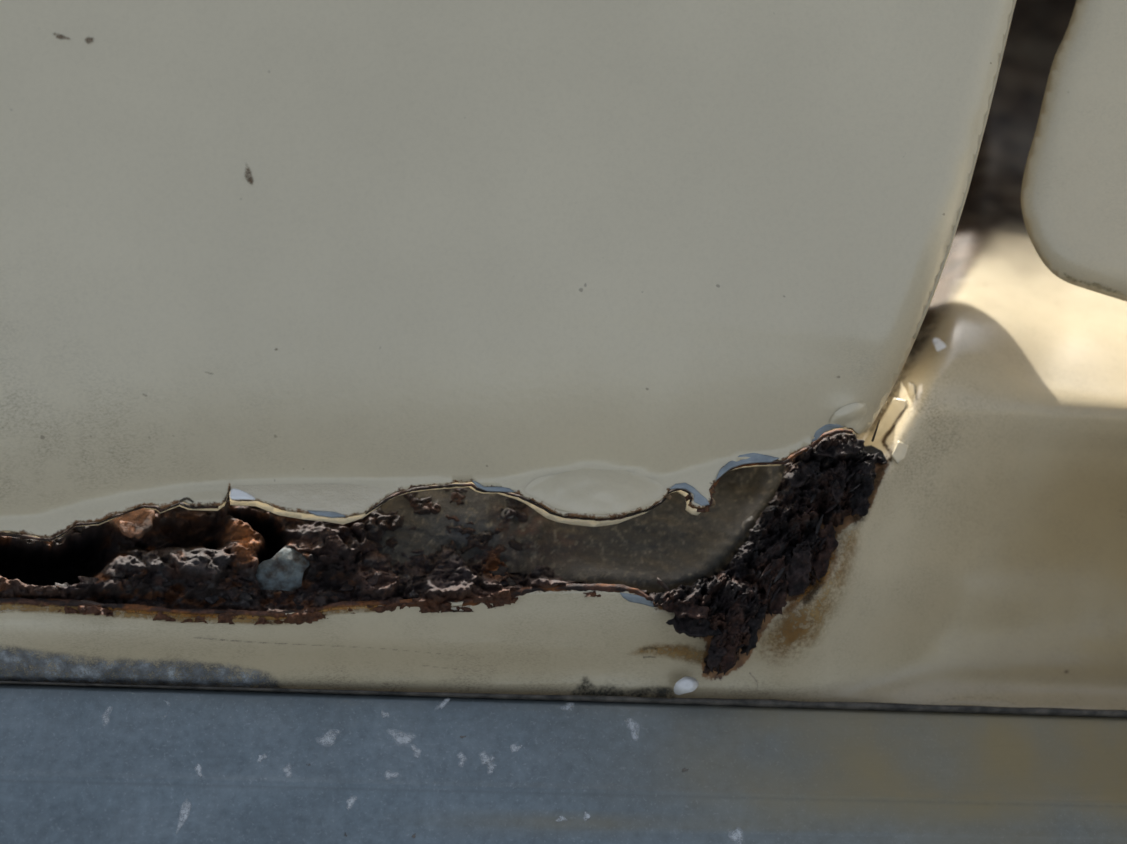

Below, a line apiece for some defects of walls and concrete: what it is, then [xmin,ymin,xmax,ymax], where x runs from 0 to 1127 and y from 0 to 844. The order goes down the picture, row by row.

peeling [230,484,386,518]
peeling [108,508,155,539]
corrosion [639,432,888,675]
peeling [620,398,909,675]
corrosion [0,603,94,615]
corrosion [108,607,219,622]
peeling [0,648,280,688]